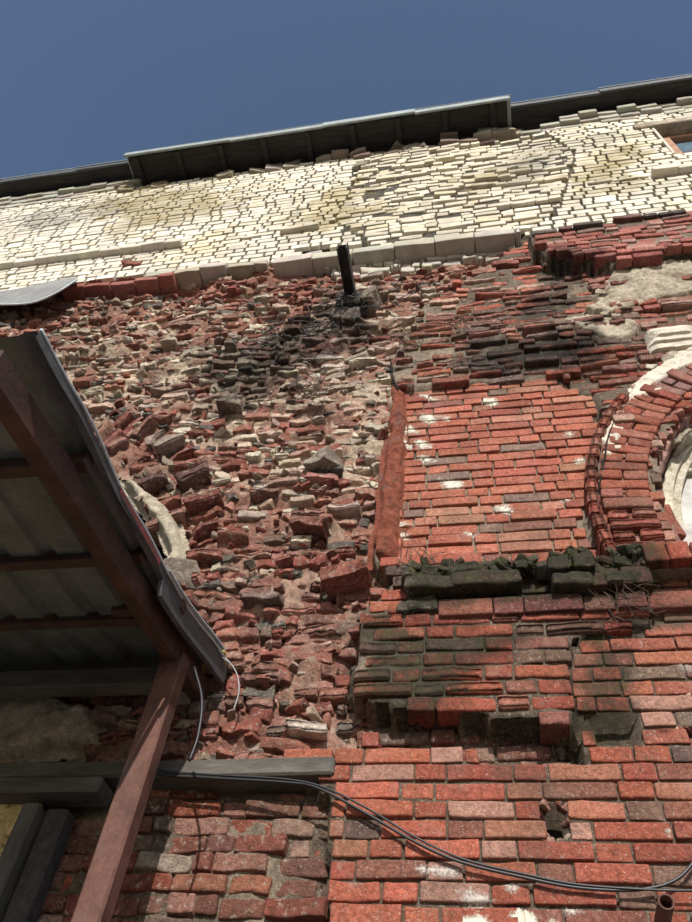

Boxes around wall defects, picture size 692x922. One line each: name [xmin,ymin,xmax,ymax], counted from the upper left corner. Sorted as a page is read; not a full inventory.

flaking render [564,259,692,340]
damp [204,315,337,411]
flaking render [620,347,692,412]
damp [404,415,450,464]
flaking render [602,420,623,455]
damp [439,478,464,490]
spalling [0,251,510,763]
damp [493,505,513,515]
damp [416,865,459,877]
damp [455,889,493,922]
damp [510,908,538,922]